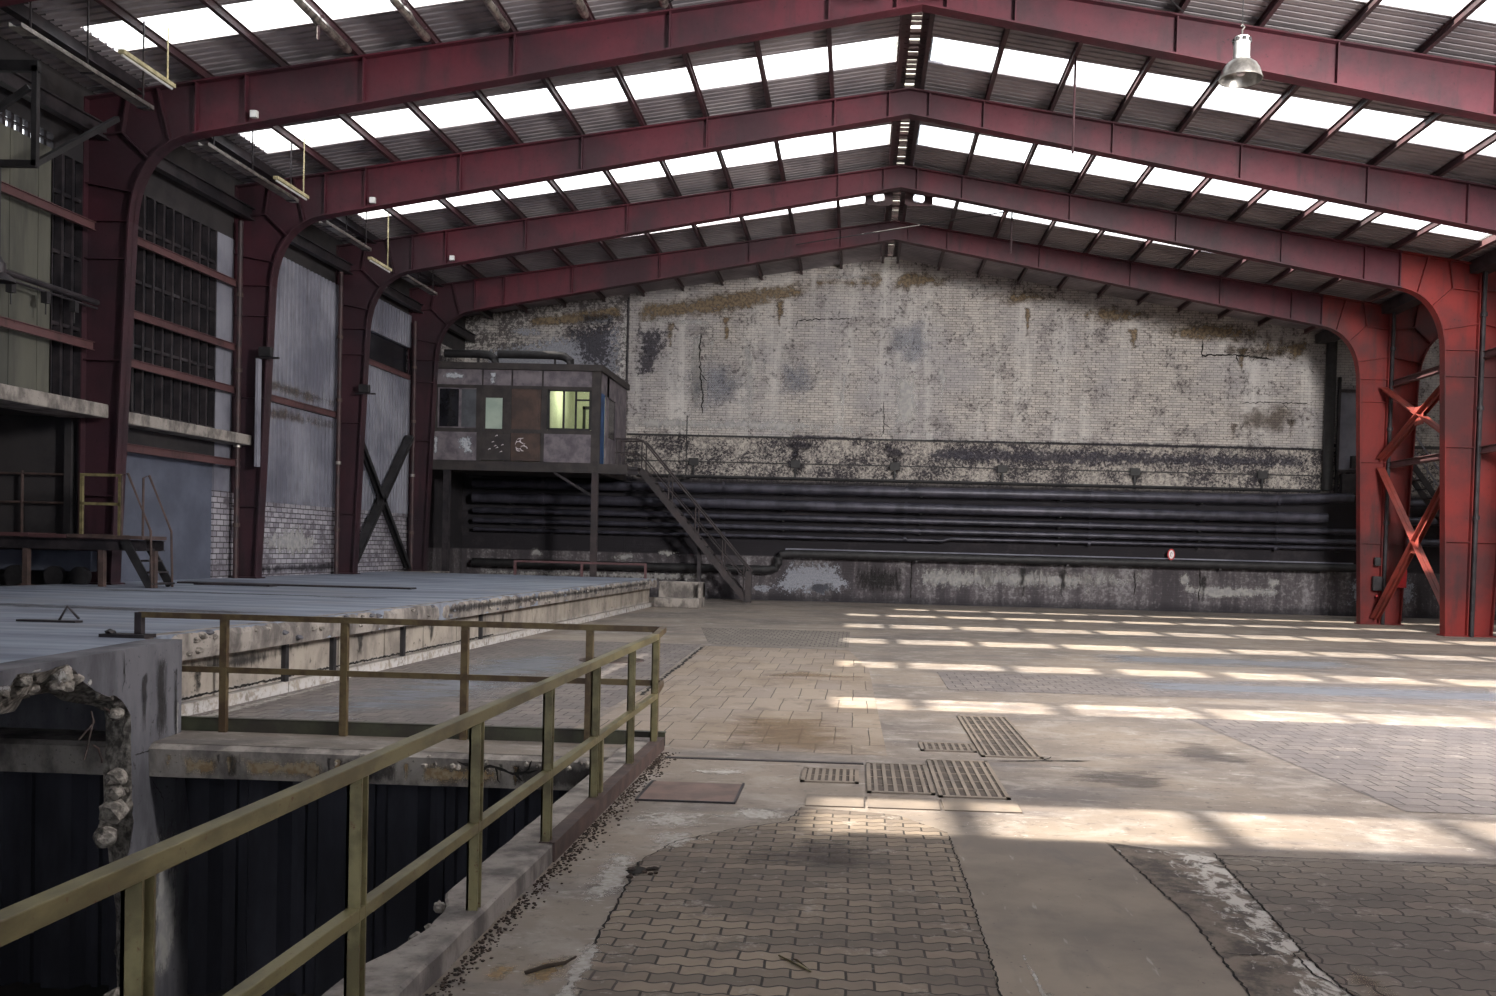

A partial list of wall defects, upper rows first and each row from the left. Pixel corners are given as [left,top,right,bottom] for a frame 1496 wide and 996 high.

spalling [0,891,121,996]
spalling [0,665,134,910]
spalling [185,778,302,829]
spalling [187,786,347,996]
spalling [366,755,568,963]